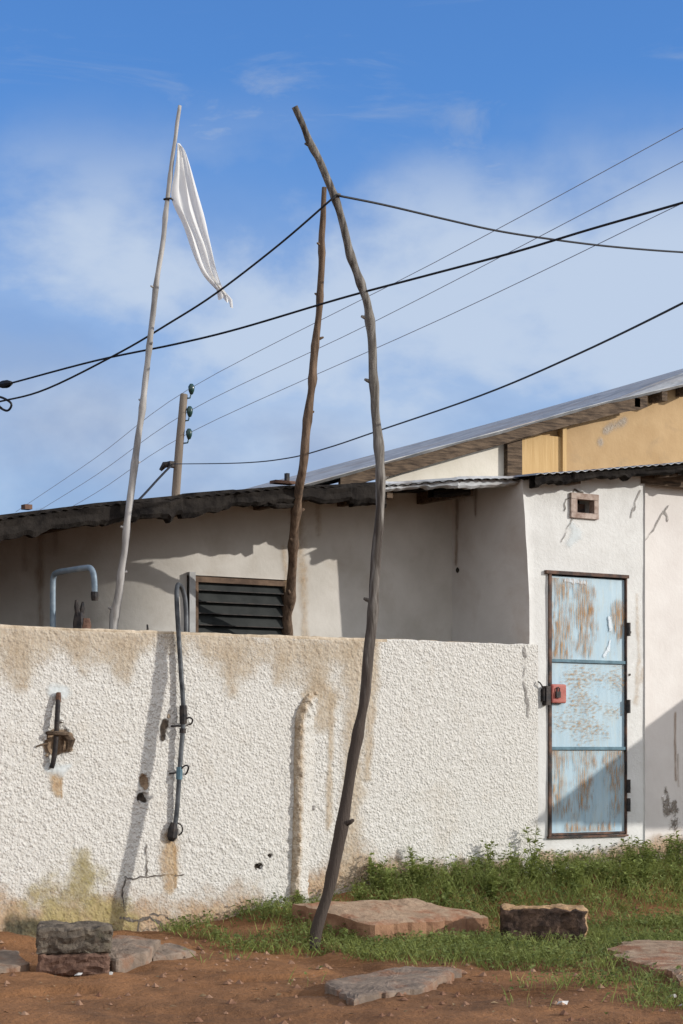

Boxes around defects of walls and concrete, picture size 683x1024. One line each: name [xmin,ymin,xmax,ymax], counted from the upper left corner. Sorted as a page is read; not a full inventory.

crack [561,489,584,542]
crack [630,490,669,537]
water stain [0,628,155,658]
corrosion [552,577,625,738]
water stain [182,635,378,876]
corrosion [52,773,62,798]
corrosion [552,751,624,832]
spalling [662,788,678,831]
crack [119,846,185,932]
water stain [5,918,38,937]